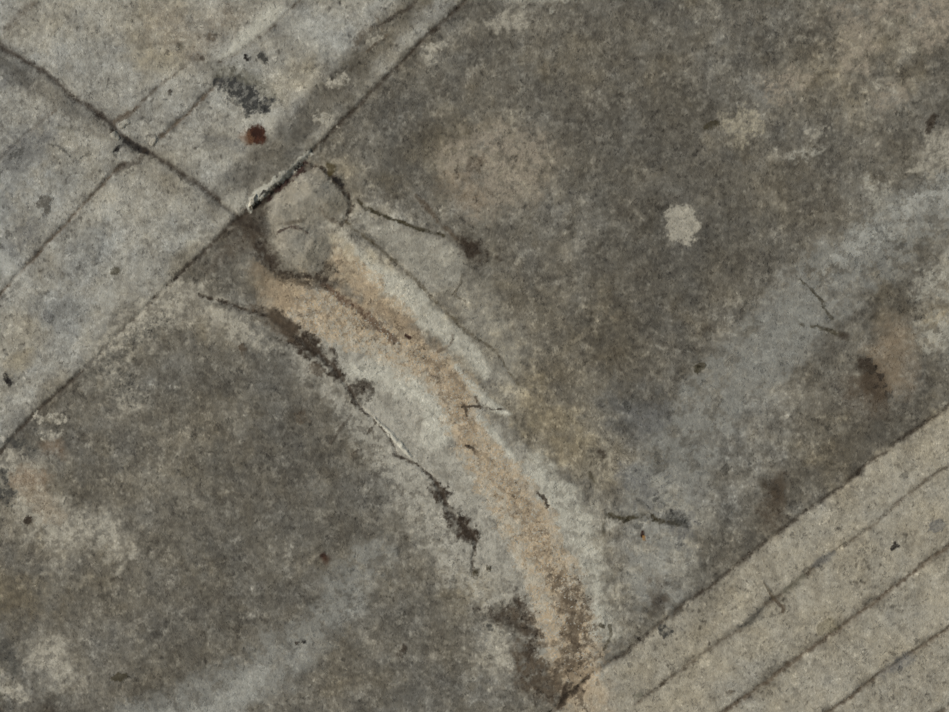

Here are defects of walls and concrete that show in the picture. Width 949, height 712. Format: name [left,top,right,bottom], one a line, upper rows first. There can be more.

corrosion [236,121,270,148]
crack [247,160,521,386]
crack [197,292,482,574]
crack [460,395,504,417]